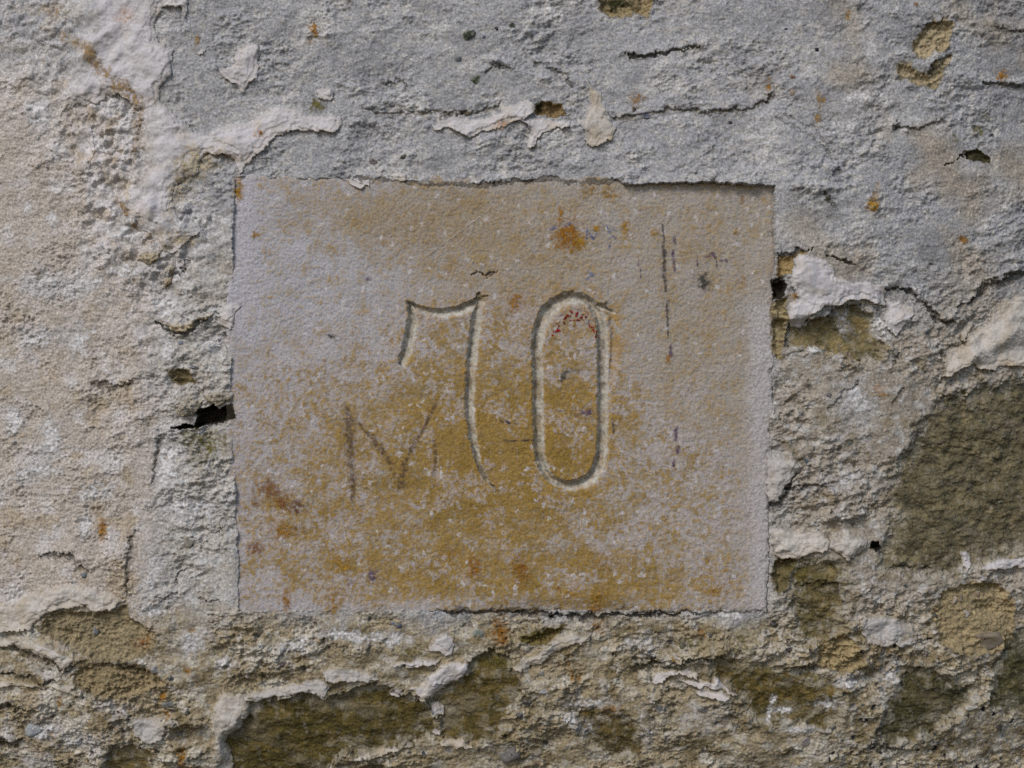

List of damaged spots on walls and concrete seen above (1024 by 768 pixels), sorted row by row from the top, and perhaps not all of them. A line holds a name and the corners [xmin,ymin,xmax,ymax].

crack [624,45,700,60]
spalling [896,17,955,90]
peeling [60,0,342,254]
peeling [432,78,617,149]
peeling [770,251,914,363]
flaking render [878,295,1024,719]
spalling [0,582,167,702]
flaking render [106,715,166,768]
flaking render [209,624,590,768]
flaking render [573,705,646,758]
flaking render [651,524,918,731]
flaking render [876,667,976,747]